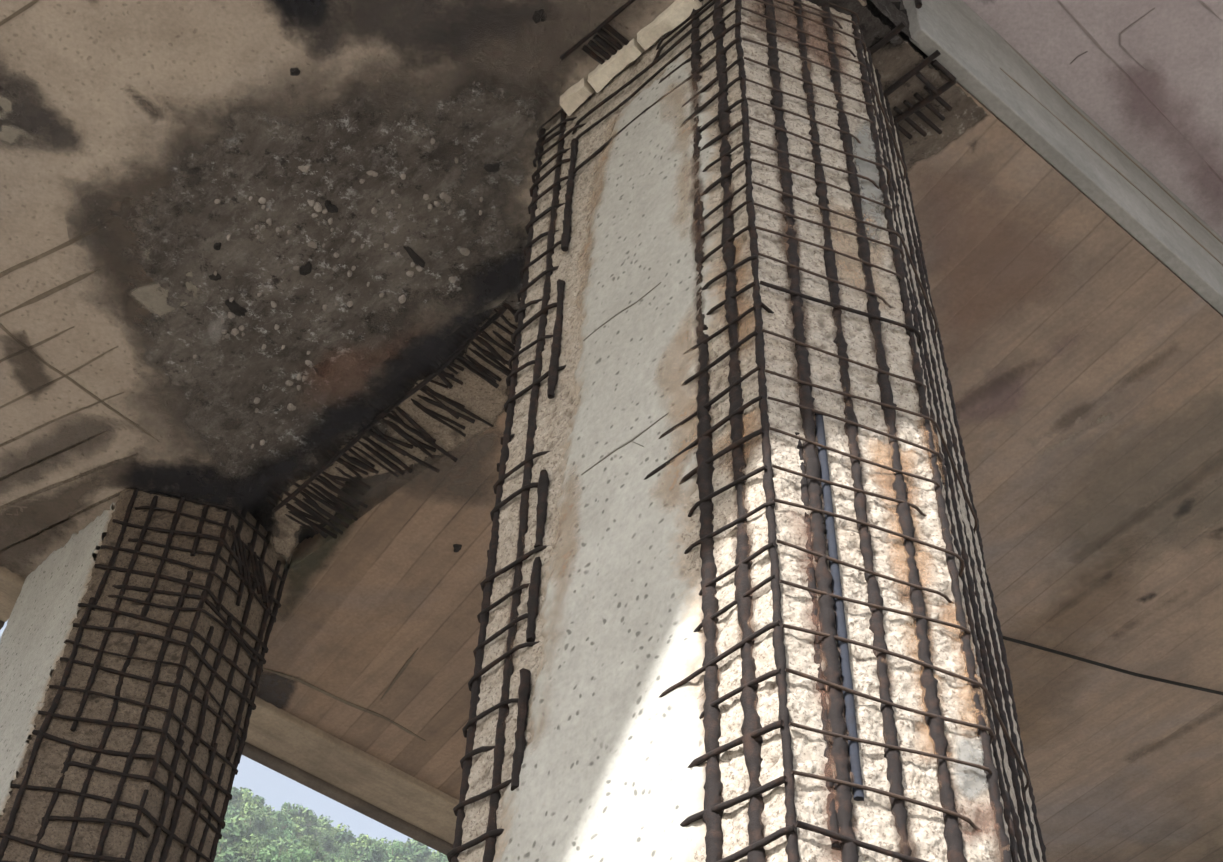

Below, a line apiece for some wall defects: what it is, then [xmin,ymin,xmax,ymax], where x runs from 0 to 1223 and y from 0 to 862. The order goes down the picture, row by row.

water stain [0,70,78,149]
water stain [261,0,643,130]
rust [785,5,845,129]
crack [1119,8,1155,69]
rust [690,150,704,256]
rust [829,207,901,302]
water stain [0,377,260,576]
rust [665,358,710,497]
rust [730,415,762,654]
rust [877,413,932,652]
spalling [0,488,227,862]
rust [944,606,967,638]